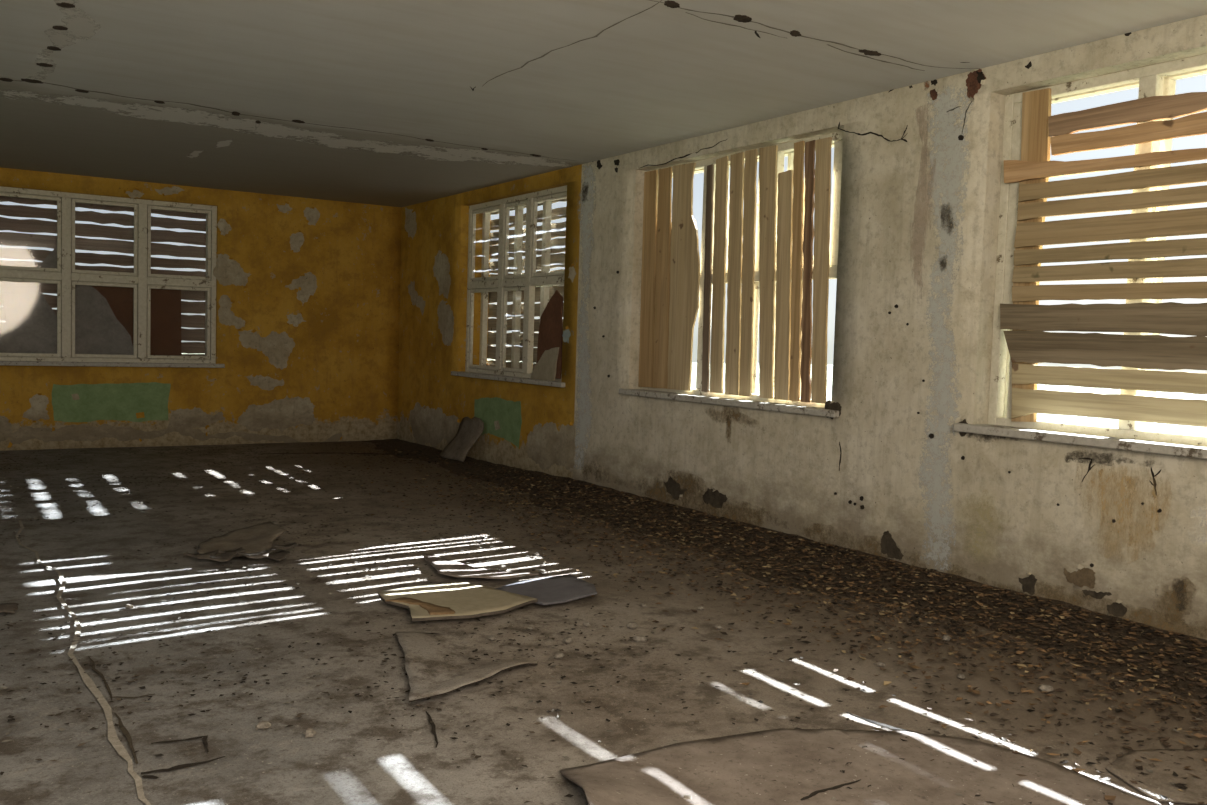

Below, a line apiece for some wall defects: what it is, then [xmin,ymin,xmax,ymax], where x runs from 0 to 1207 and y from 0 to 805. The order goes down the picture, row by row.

flaking render [28,0,99,79]
crack [471,0,980,91]
crack [838,122,908,142]
crack [947,101,972,140]
peeling [276,201,320,252]
peeling [408,250,454,346]
peeling [167,251,317,432]
peeling [22,393,49,422]
peeling [407,402,460,448]
peeling [527,421,576,473]
leakage [1065,451,1158,547]